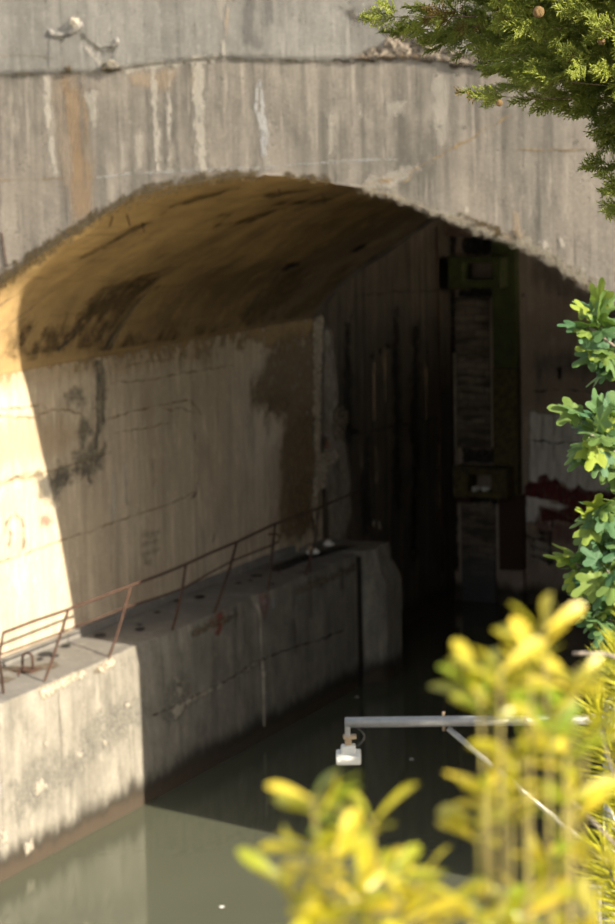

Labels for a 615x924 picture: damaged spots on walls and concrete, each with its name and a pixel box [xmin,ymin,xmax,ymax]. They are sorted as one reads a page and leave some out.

spalling [346,10,485,66]
corrosion [53,74,93,222]
crack [0,404,83,419]
leakage [250,328,324,539]
crack [0,452,112,484]